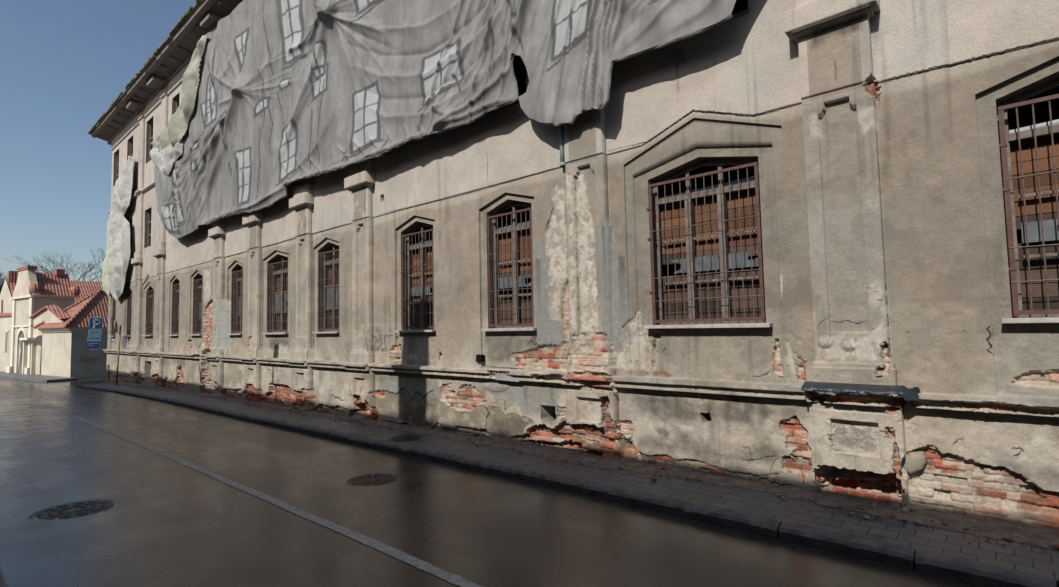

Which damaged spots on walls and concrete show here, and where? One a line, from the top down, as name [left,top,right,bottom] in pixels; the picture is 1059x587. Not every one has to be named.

flaking render [107,365,186,390]
flaking render [187,268,412,426]
flaking render [389,169,1059,531]